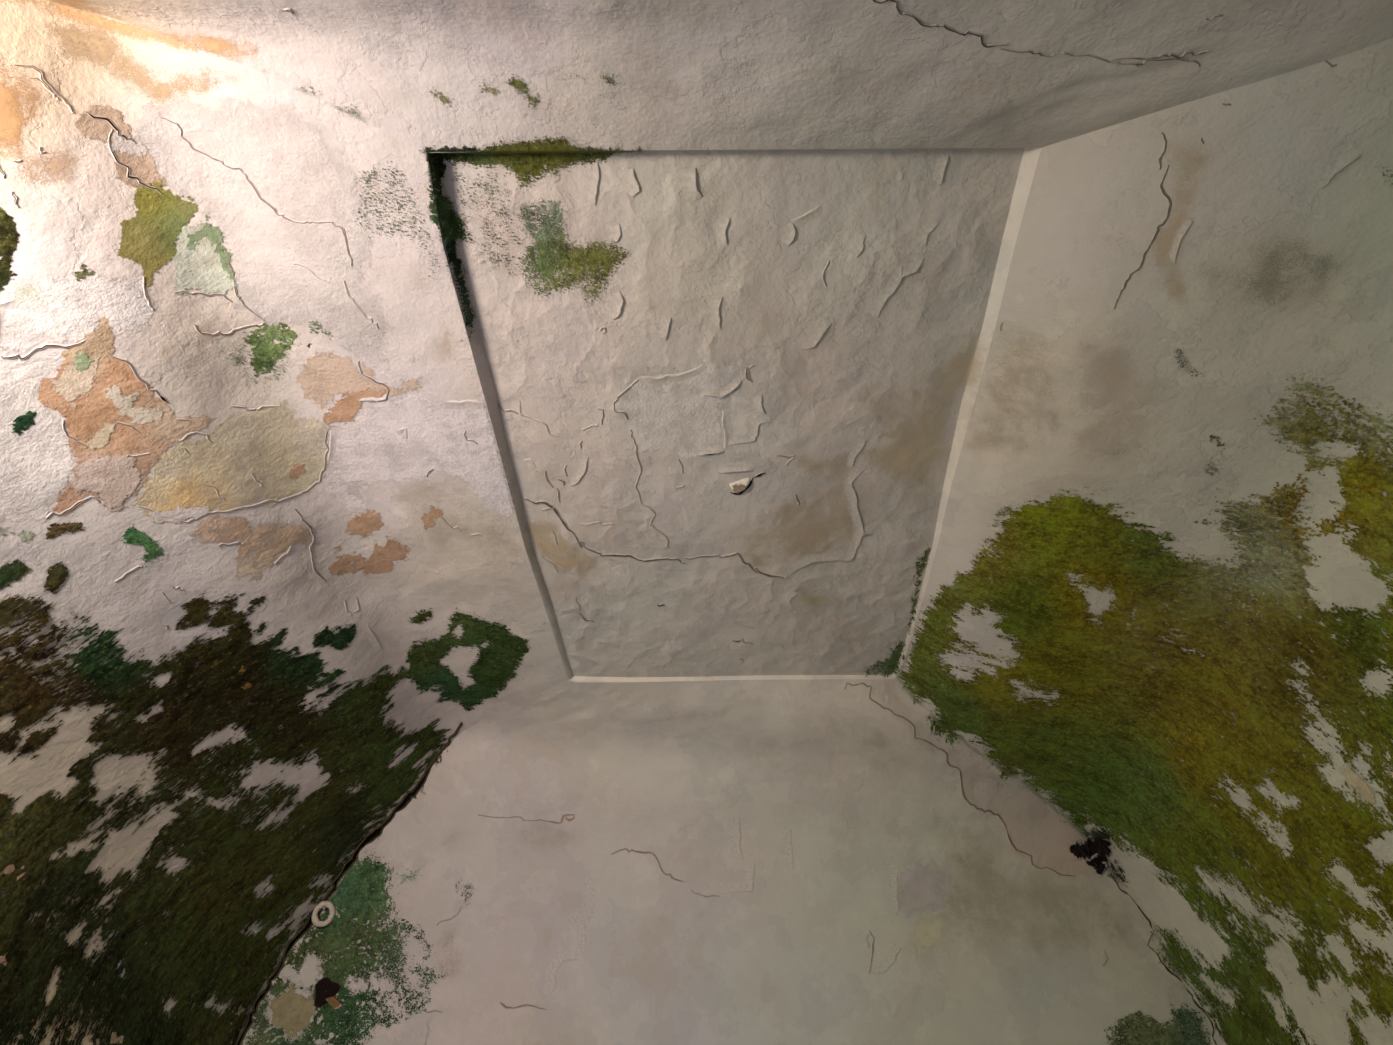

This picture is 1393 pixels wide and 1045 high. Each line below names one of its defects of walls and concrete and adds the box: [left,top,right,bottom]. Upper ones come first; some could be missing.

crack [872,0,1223,67]
crack [14,64,162,194]
peeling [74,105,237,295]
crack [142,250,264,336]
crack [161,116,379,329]
crack [1113,132,1172,309]
peeling [0,299,485,581]
crack [498,379,787,623]
water stain [729,313,1085,614]
crack [235,722,463,1045]
crack [611,847,720,898]
water stain [1105,858,1131,887]